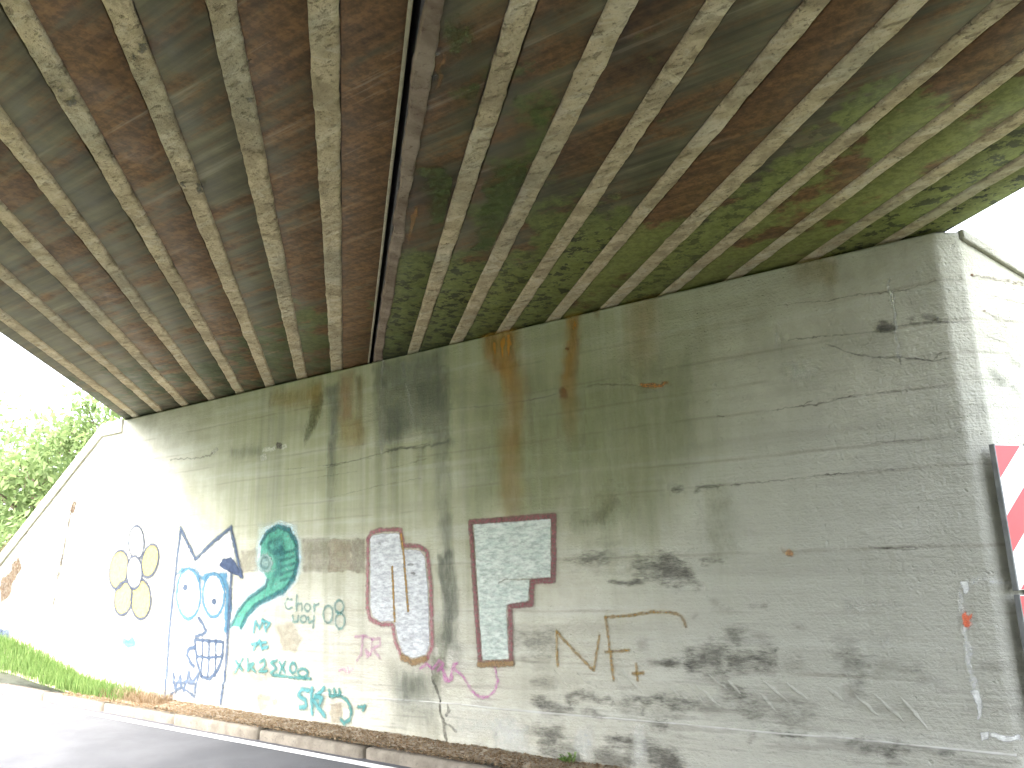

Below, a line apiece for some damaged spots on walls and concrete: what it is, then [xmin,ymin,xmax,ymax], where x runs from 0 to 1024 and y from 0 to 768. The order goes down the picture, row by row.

water stain [439,554,456,641]